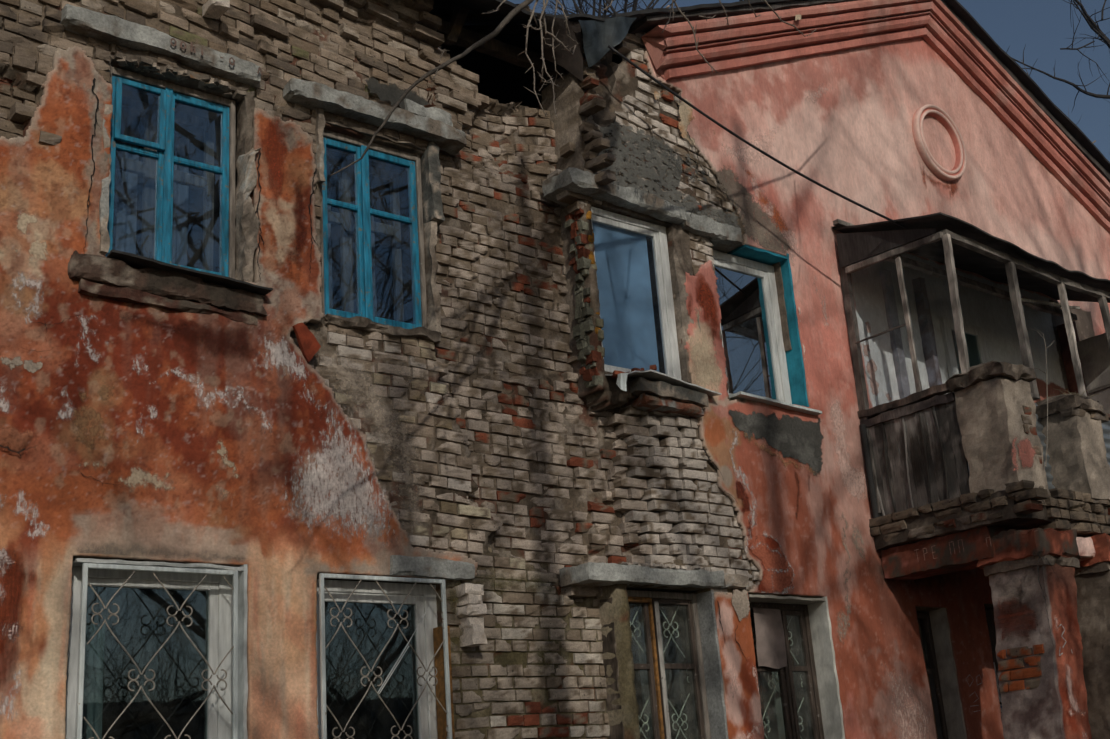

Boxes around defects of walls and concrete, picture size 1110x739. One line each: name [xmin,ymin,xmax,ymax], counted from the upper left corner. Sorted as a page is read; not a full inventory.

crack [83,78,99,249]
water stain [123,314,250,355]
water stain [173,370,269,428]
water stain [265,338,312,400]
spalling [0,0,798,739]
water stain [17,493,45,538]
water stain [285,407,386,531]
flaking render [995,598,1045,692]